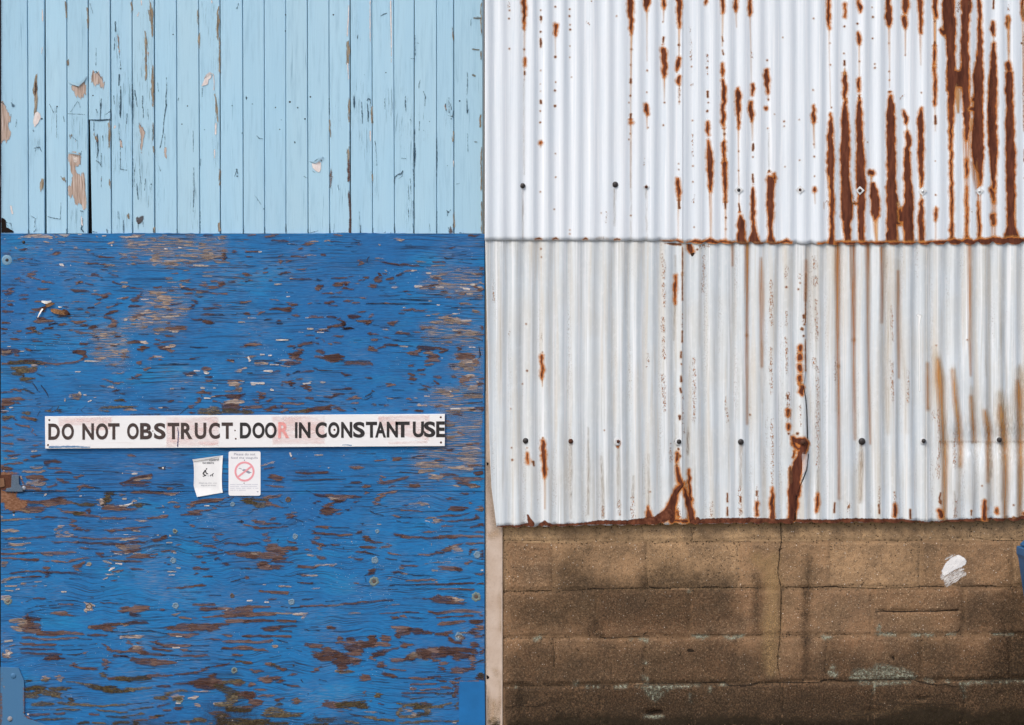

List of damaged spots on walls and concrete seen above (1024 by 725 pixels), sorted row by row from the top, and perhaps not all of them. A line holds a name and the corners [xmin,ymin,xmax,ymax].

peeling [1,0,484,725]
corrosion [497,0,1024,527]
crack [528,524,1017,709]